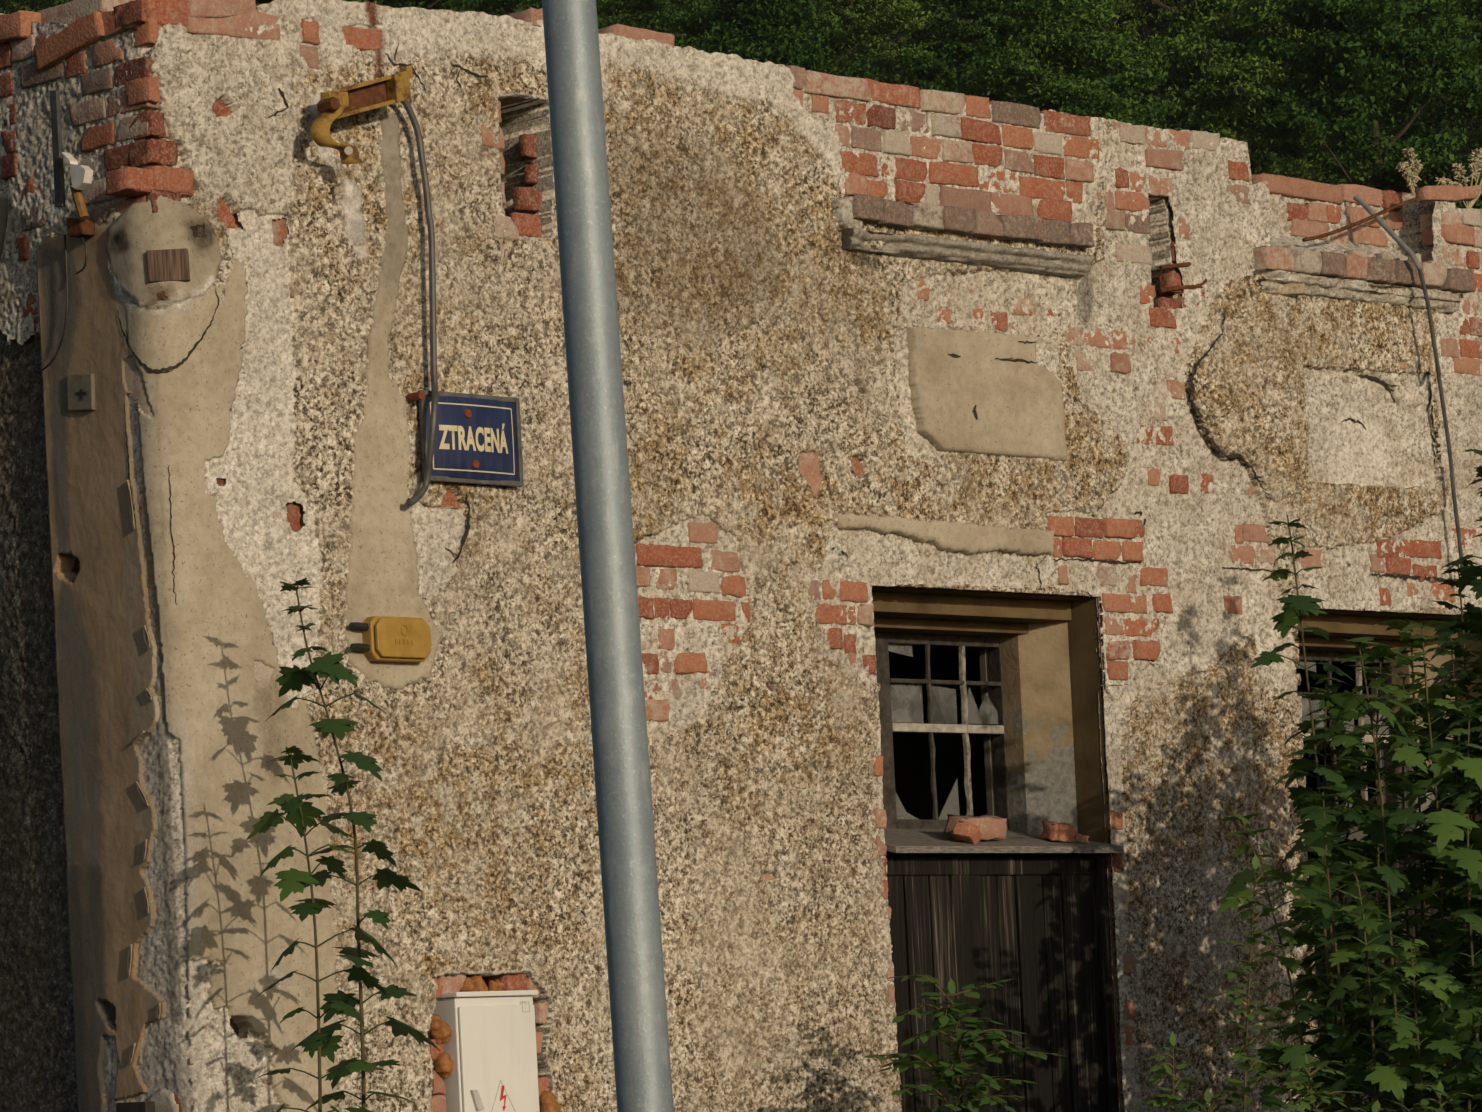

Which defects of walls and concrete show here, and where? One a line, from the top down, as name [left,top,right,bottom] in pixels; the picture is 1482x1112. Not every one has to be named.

spalling [0,0,195,345]
spalling [212,98,232,117]
spalling [299,18,320,72]
spalling [342,24,382,53]
peeling [103,355,283,1112]
spalling [634,514,752,739]
spalling [786,65,1482,1112]